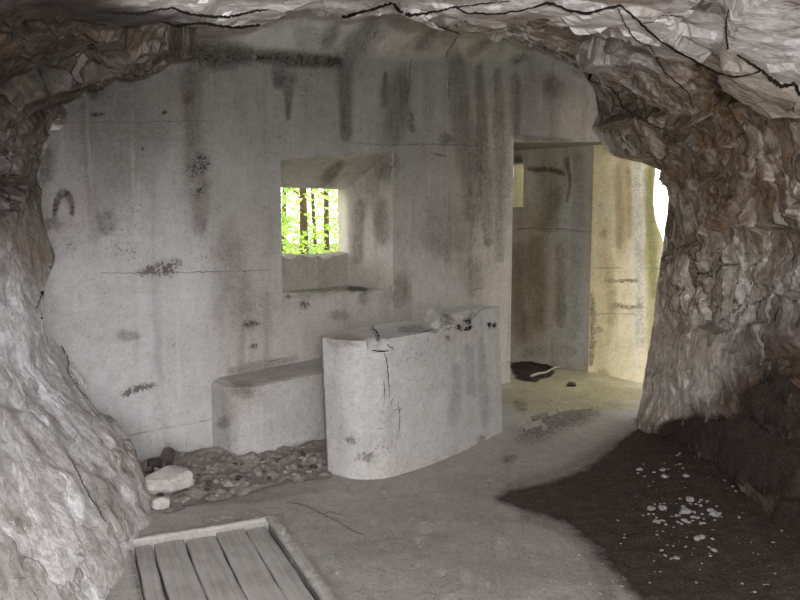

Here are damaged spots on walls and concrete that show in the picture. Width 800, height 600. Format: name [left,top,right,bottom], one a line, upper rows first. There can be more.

crack [372,326,400,438]
crack [287,502,363,535]